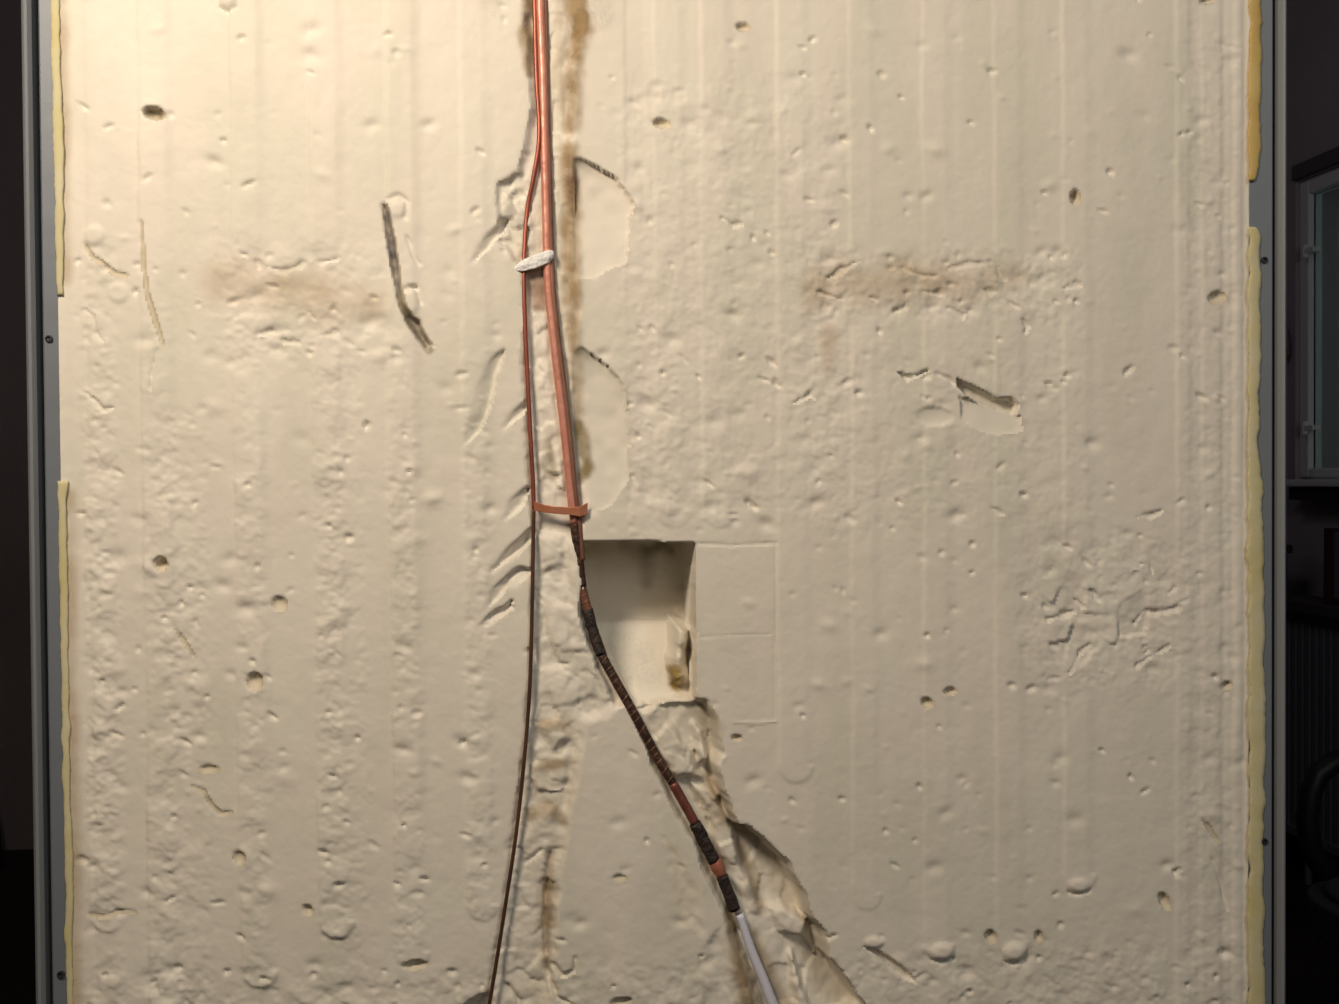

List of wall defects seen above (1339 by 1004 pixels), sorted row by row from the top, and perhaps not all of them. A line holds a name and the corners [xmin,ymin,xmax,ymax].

water stain [567,0,588,94]
water stain [562,146,579,302]
spalling [888,260,1008,321]
spalling [896,369,932,383]
spalling [956,379,1024,436]
water stain [576,423,592,476]
spalling [465,0,865,1004]
spalling [403,959,429,972]